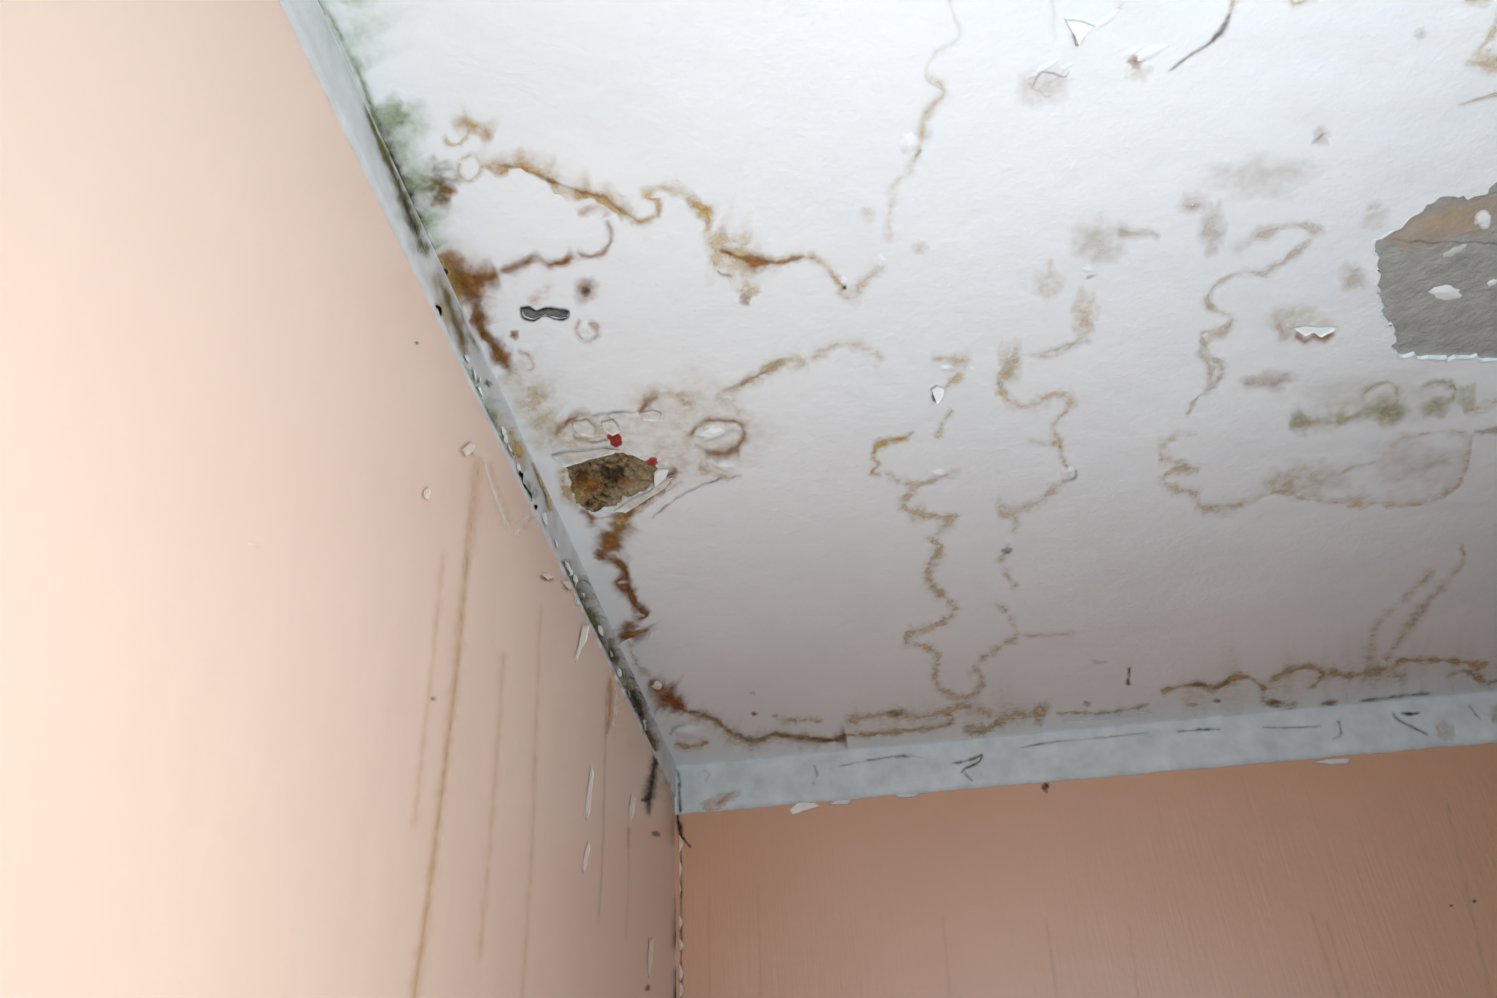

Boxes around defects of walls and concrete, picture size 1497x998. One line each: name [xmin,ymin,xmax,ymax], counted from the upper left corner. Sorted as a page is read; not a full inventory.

water stain [352,61,556,254]
water stain [575,189,622,215]
water stain [691,201,814,294]
water stain [1260,224,1319,274]
peeling [1372,182,1497,364]
water stain [736,360,786,389]
water stain [931,358,962,433]
flaking render [551,412,676,522]
water stain [871,437,907,474]
water stain [818,469,1047,743]
water stain [563,563,658,810]
water stain [1162,647,1497,706]